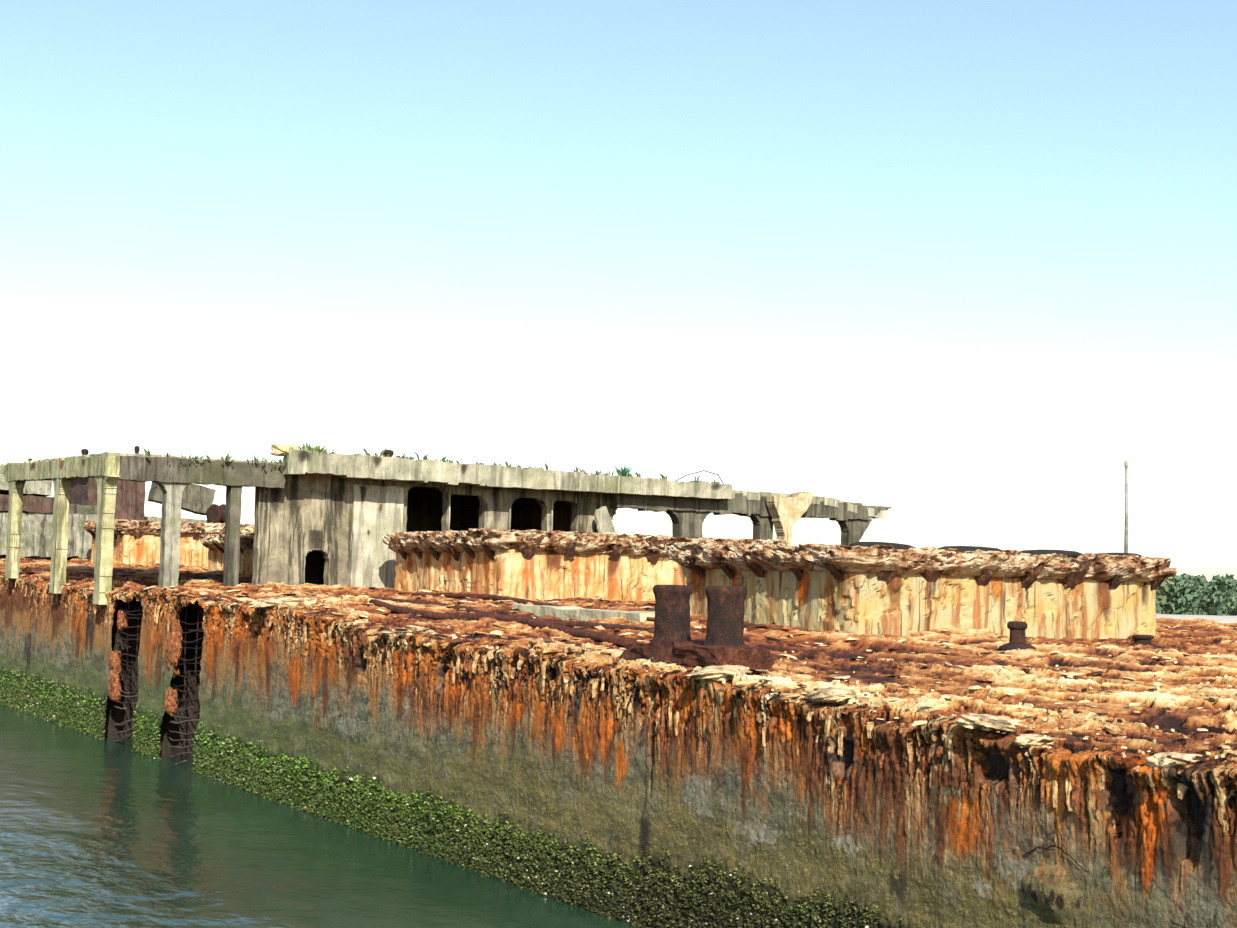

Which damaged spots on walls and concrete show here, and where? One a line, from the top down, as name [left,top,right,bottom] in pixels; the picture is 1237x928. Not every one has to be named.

spalling [105,596,163,742]
spalling [159,601,204,766]
corrosion [205,605,364,718]
corrosion [369,593,654,647]
leakage [640,818,649,858]
corrosion [666,686,825,829]
leakage [736,815,775,847]
spalling [745,701,883,778]
peeling [927,732,954,763]
leakage [973,847,1029,899]
corrosion [1043,749,1097,832]
leakage [1168,766,1215,884]